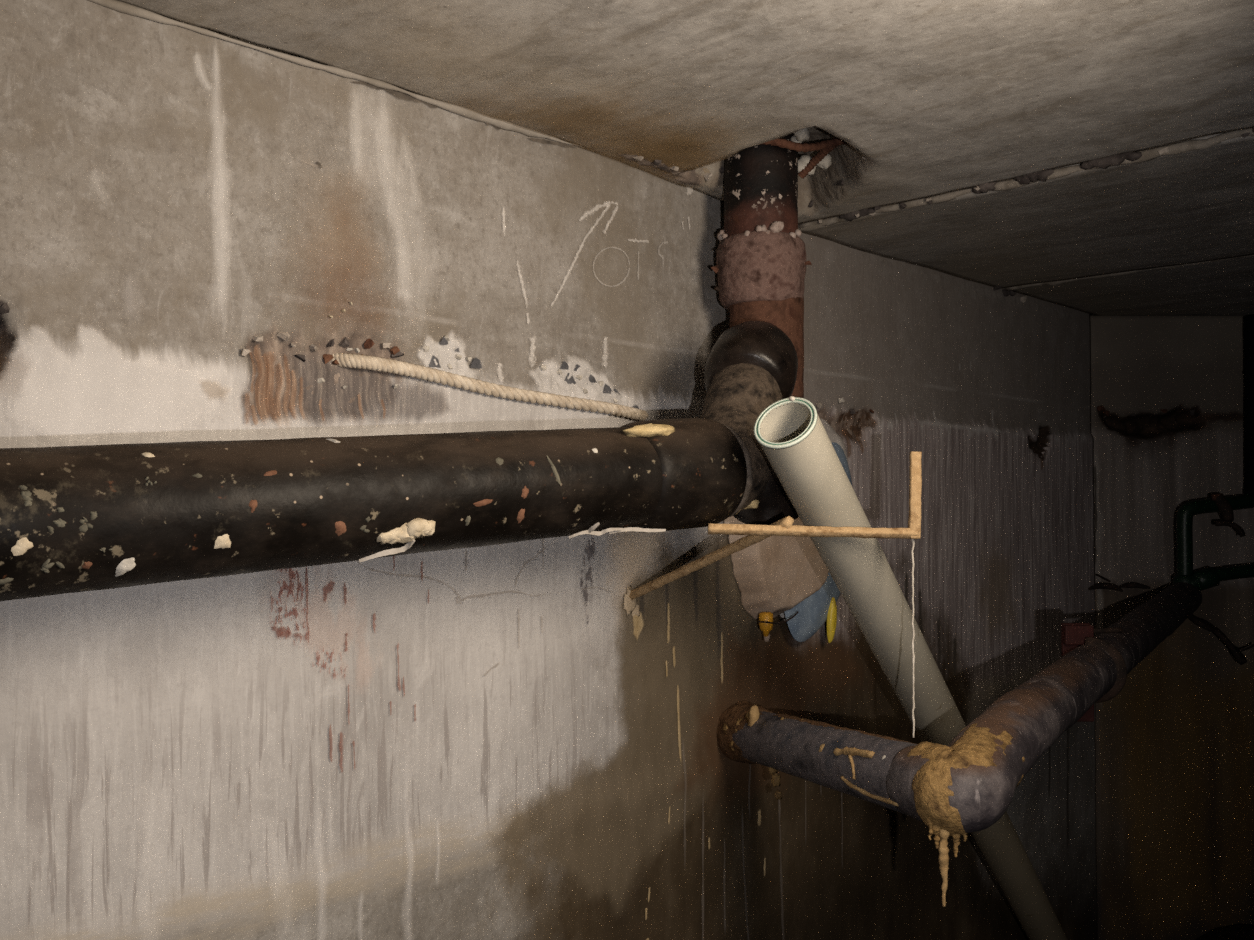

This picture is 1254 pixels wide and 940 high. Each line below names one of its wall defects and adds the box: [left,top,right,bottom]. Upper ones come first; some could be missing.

spalling [0,300,17,372]
peeling [14,329,226,439]
spalling [240,330,446,424]
flaking render [419,335,482,378]
flaking render [531,359,639,409]
rust [271,567,309,640]
rust [323,582,347,605]
rust [313,633,350,720]
rust [329,725,355,771]
water stain [503,535,1029,940]